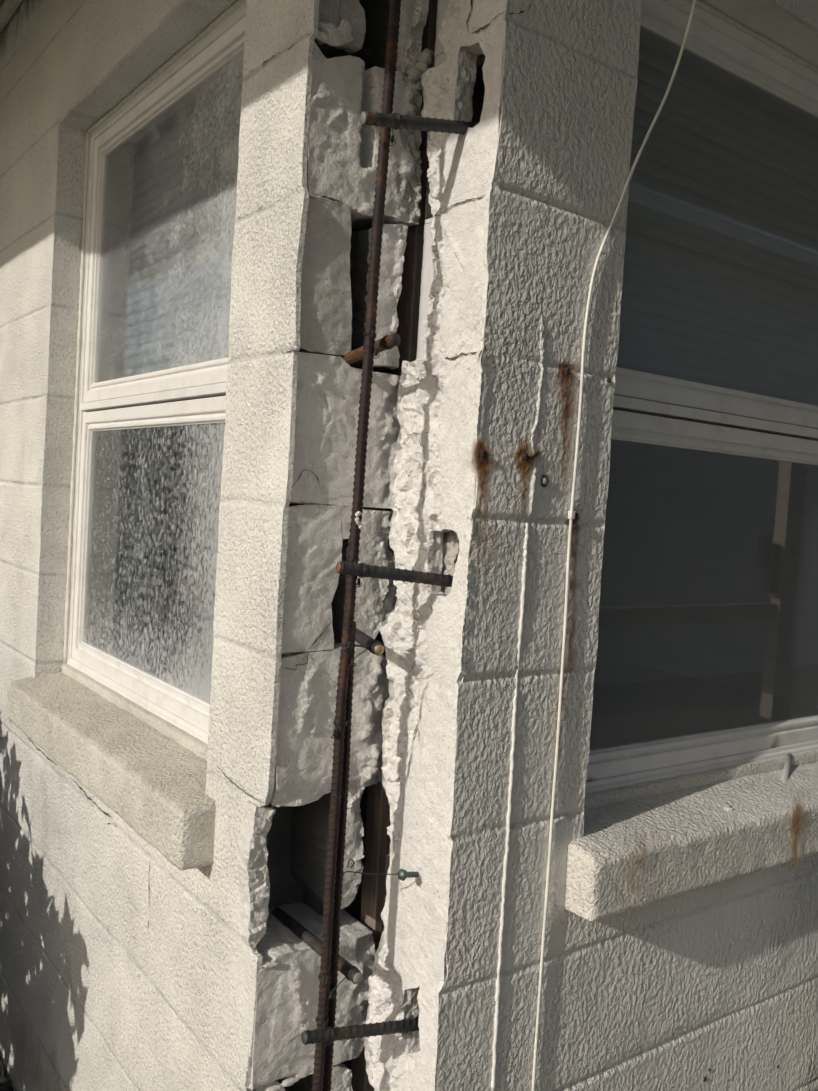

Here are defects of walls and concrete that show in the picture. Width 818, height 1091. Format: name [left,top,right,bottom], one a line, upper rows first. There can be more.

rust [559,363,573,473]
crack [292,470,339,506]
crack [407,432,429,506]
rust [474,440,490,498]
rust [516,441,540,490]
spalling [237,0,505,1091]
rust [568,506,579,598]
crack [282,621,332,670]
crack [403,617,432,800]
rust [792,804,803,867]